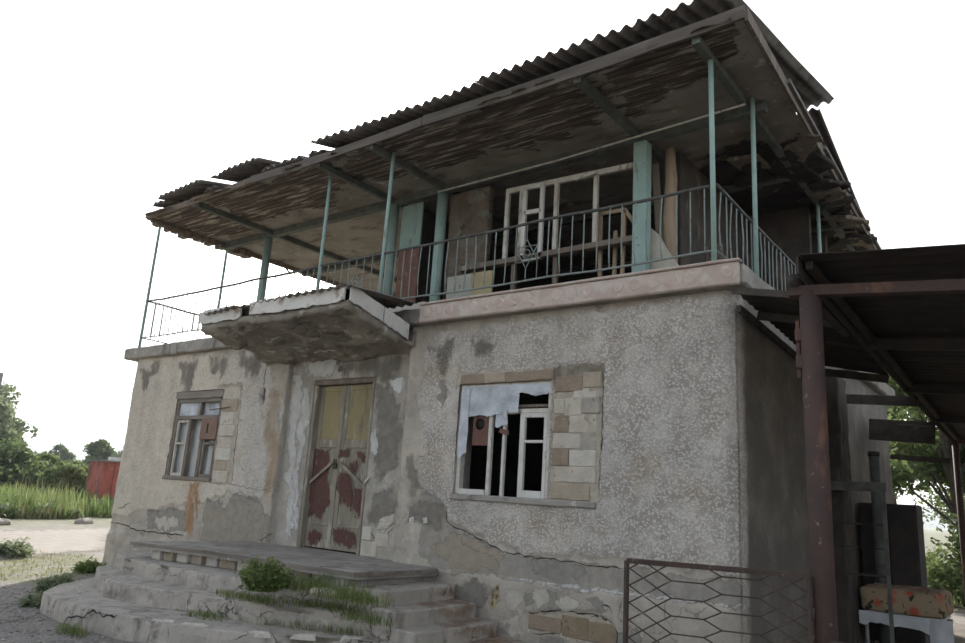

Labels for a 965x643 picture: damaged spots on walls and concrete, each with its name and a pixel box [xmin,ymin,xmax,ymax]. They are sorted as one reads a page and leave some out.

damp [180,363,195,391]
peeling [272,359,343,538]
crack [111,503,184,539]
corrosion [186,484,199,534]
crack [446,507,624,569]
flaking render [409,489,742,639]
crack [64,606,121,629]